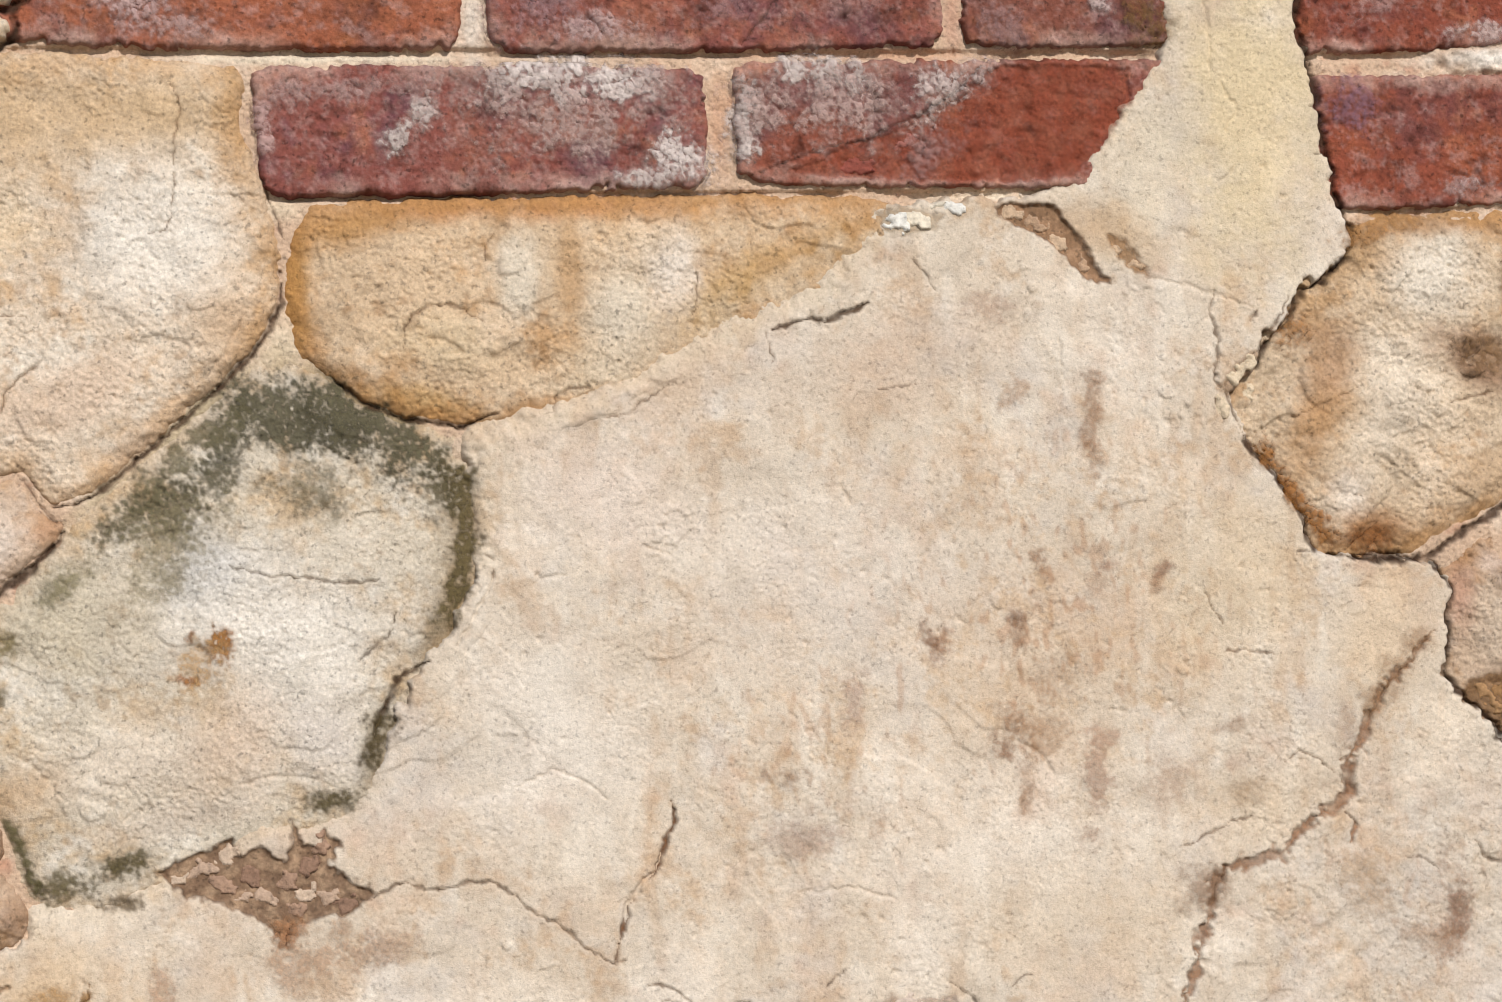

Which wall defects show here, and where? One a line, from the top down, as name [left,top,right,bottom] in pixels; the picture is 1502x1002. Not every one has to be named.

efflorescence [380,79,437,156]
efflorescence [479,0,666,156]
efflorescence [616,127,718,189]
leakage [723,53,899,159]
flaking render [875,201,966,236]
spalling [995,203,1110,284]
crack [1254,0,1351,369]
crack [772,302,868,330]
crack [1182,374,1502,1000]
flaking render [1462,674,1502,731]
crack [651,806,677,876]
spalling [159,826,373,938]